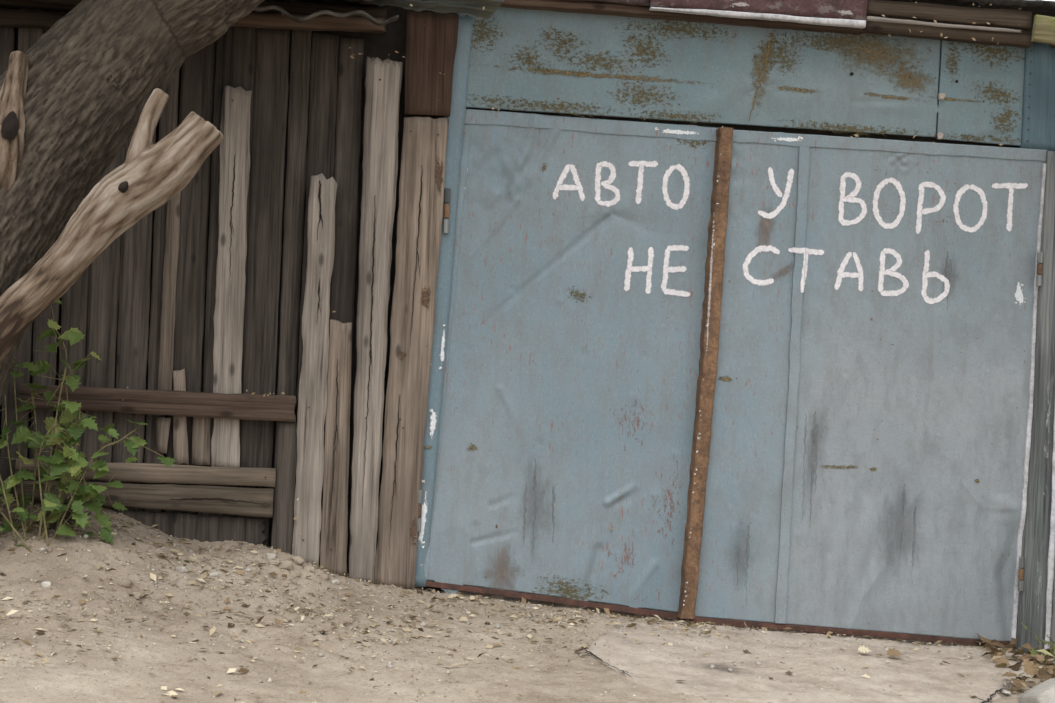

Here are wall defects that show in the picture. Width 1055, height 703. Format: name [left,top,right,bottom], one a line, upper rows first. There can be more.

corrosion [465,14,503,52]
corrosion [468,19,739,125]
corrosion [749,32,1025,119]
corrosion [944,80,1021,144]
corrosion [533,575,609,607]